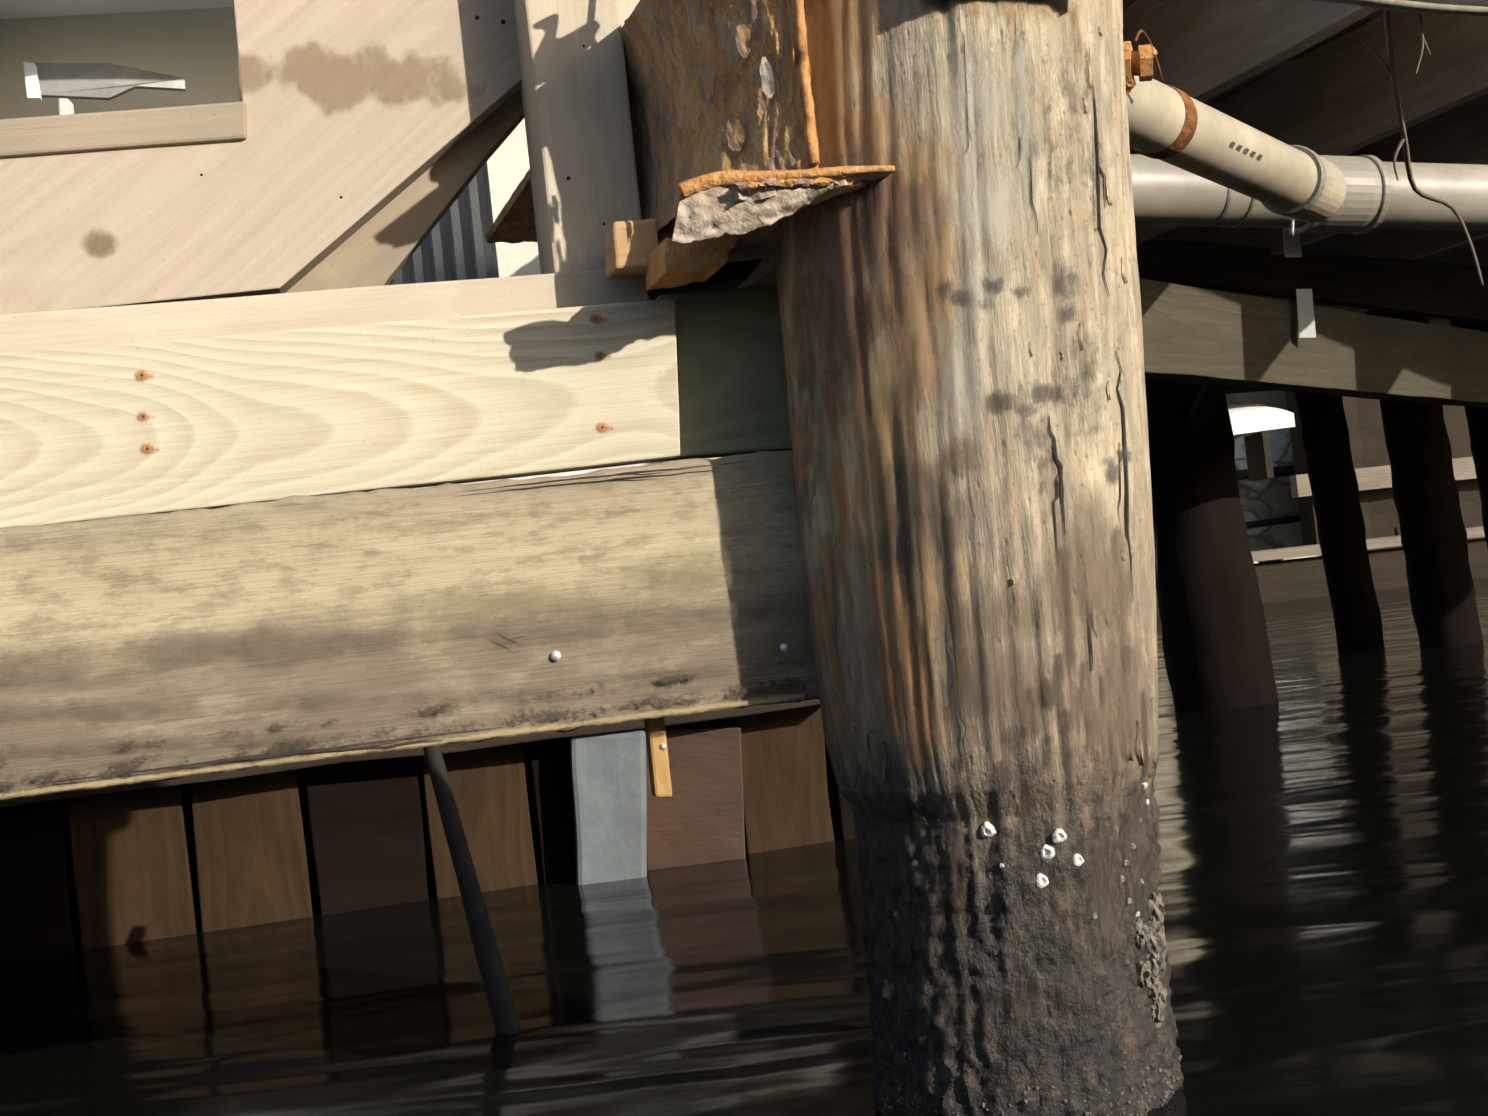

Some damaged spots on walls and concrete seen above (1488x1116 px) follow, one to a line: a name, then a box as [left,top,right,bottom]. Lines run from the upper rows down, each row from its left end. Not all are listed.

leakage [238,58,261,87]
leakage [288,46,461,107]
leakage [938,39,1095,321]
leakage [945,340,1099,457]
leakage [880,440,973,594]
leakage [146,629,386,659]
leakage [214,662,805,762]
leakage [0,739,194,793]
leakage [854,753,1043,1038]